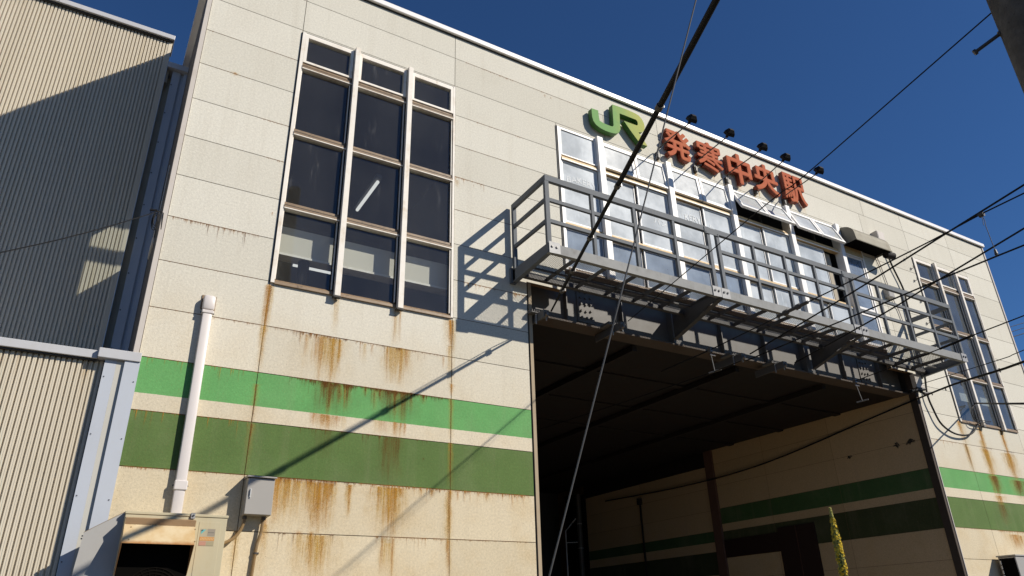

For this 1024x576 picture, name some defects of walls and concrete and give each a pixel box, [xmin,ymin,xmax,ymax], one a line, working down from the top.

rust [297,377,452,400]
rust [275,477,440,518]